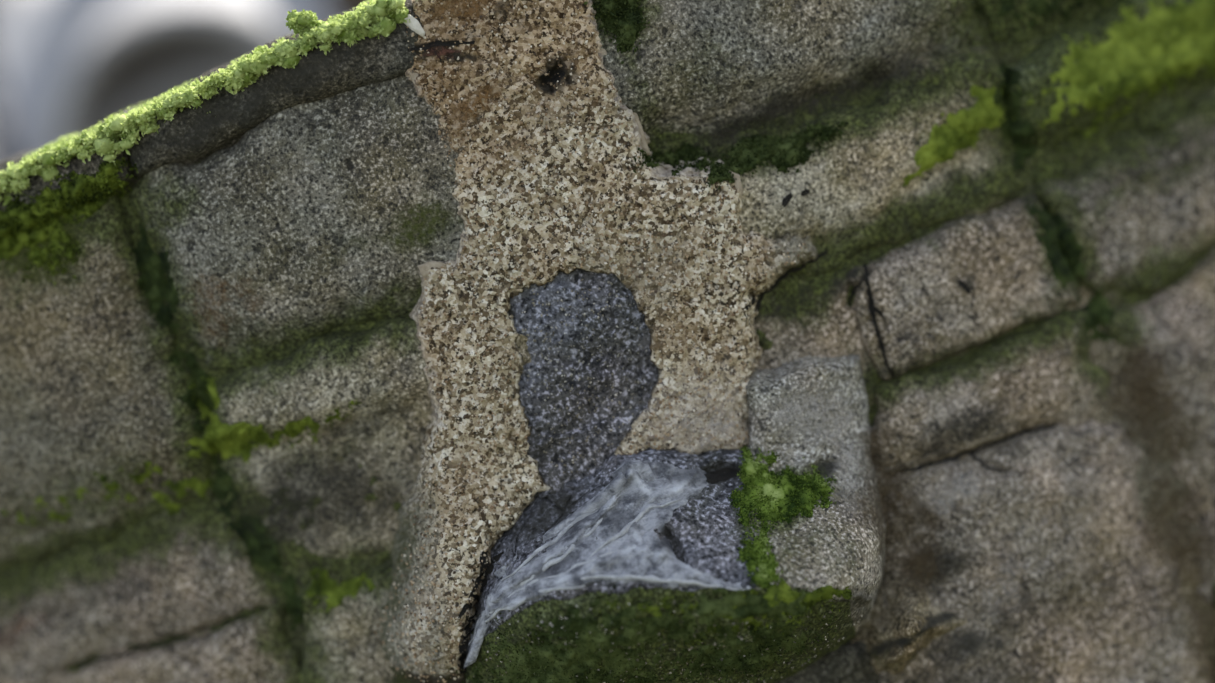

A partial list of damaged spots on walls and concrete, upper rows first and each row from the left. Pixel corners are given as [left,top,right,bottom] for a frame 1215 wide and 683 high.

spalling [374,0,817,683]